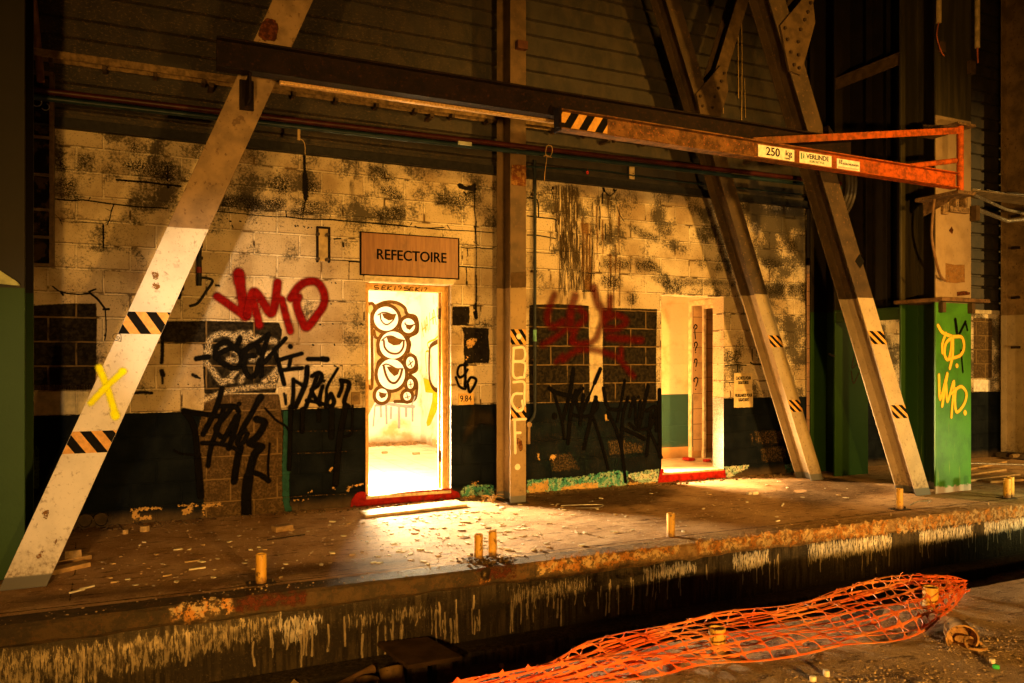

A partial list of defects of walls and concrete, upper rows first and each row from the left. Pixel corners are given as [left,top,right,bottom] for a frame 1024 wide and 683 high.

rust [258,18,279,41]
damp [466,191,478,319]
damp [550,185,612,296]
rust [695,505,1024,556]
damp [0,613,330,683]
rust [169,590,307,622]
damp [343,599,459,658]
damp [471,595,480,635]
damp [508,562,708,633]